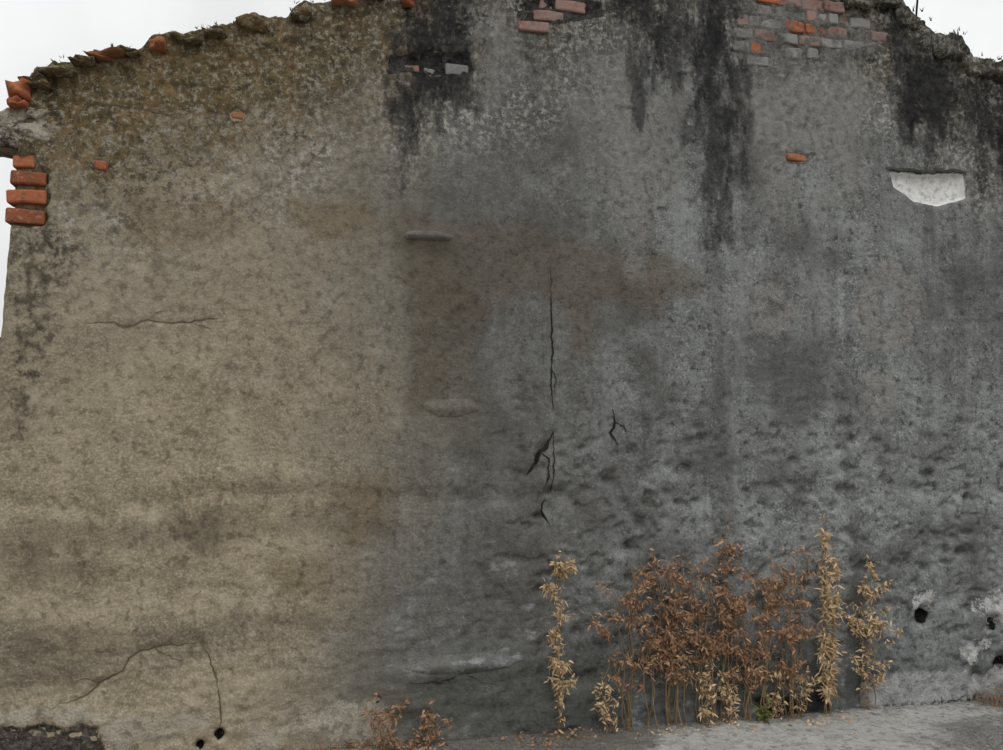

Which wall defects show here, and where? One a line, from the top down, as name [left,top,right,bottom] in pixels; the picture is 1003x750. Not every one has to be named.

spalling [518,0,602,34]
spalling [732,0,888,73]
spalling [389,51,472,76]
spalling [886,166,966,207]
crack [87,310,217,329]
crack [549,263,557,407]
crack [527,432,555,525]
peeling [912,589,937,623]
peeling [959,589,1003,674]
crack [65,642,222,727]
spalling [0,722,104,750]